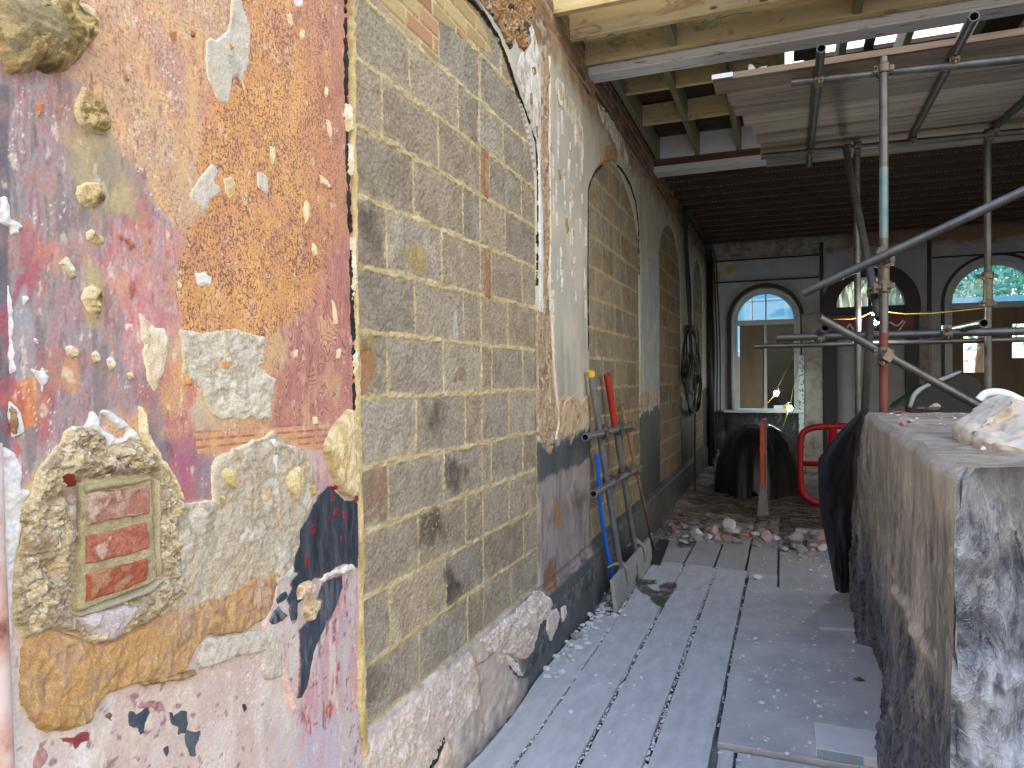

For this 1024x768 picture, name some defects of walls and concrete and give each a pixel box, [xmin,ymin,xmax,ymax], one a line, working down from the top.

peeling [205,0,251,104]
peeling [190,164,236,210]
peeling [479,0,587,321]
spalling [12,313,359,733]
peeling [480,564,597,679]
flaking render [364,651,480,768]